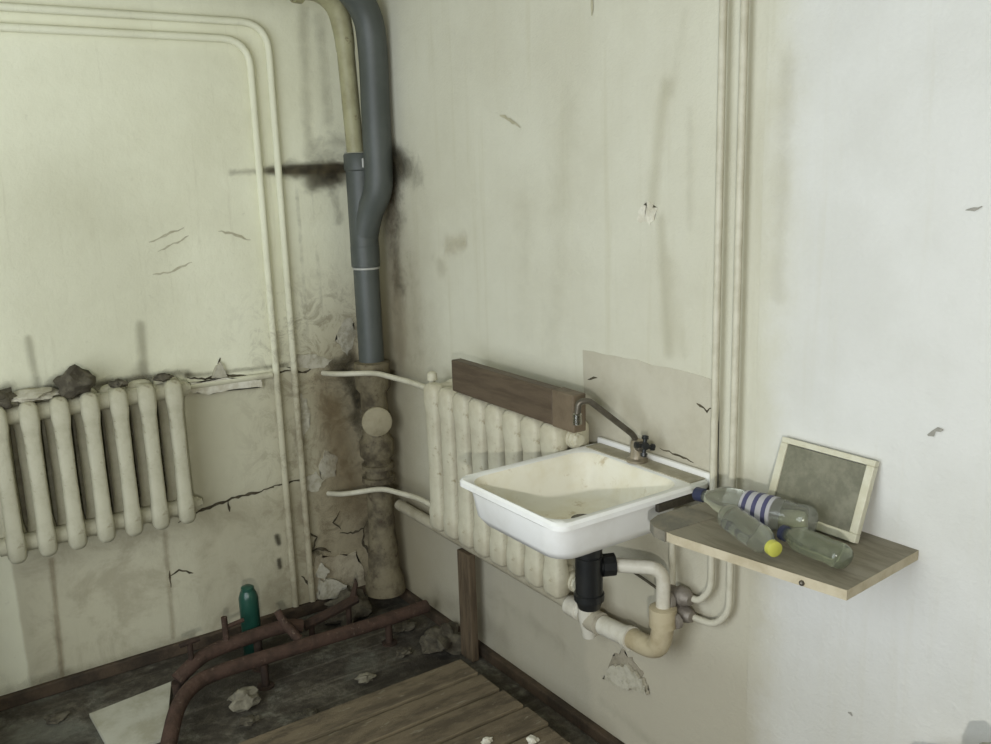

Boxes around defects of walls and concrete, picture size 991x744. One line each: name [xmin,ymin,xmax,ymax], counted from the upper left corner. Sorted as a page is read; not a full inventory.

leakage [266,163,346,176]
leakage [390,146,407,202]
leakage [332,355,361,423]
peeling [306,450,338,492]
crack [178,478,322,523]
spalling [313,551,369,600]
peeling [602,648,649,695]